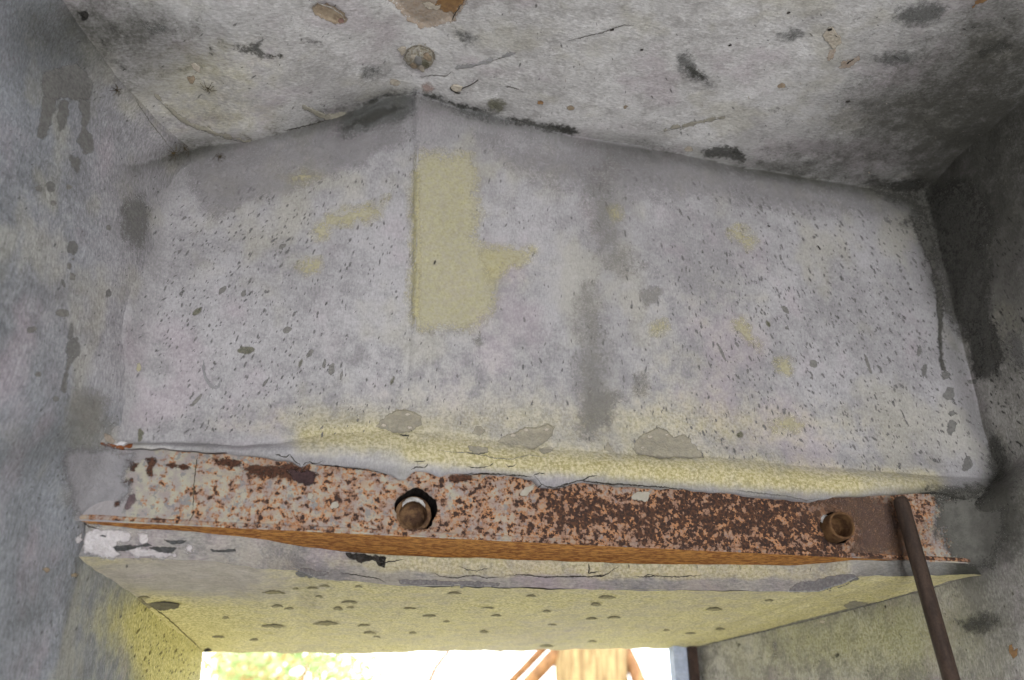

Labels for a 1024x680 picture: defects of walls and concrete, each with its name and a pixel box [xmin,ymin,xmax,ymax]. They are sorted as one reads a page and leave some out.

water stain [37,64,94,173]
water stain [338,94,577,138]
spalling [146,169,437,439]
spalling [633,177,997,476]
water stain [866,176,1024,436]
rust [100,429,190,510]
rust [212,458,319,486]
rust [449,474,472,483]
crack [400,434,683,490]
peeling [631,491,650,502]
spalling [101,535,187,553]
rust [811,497,900,554]